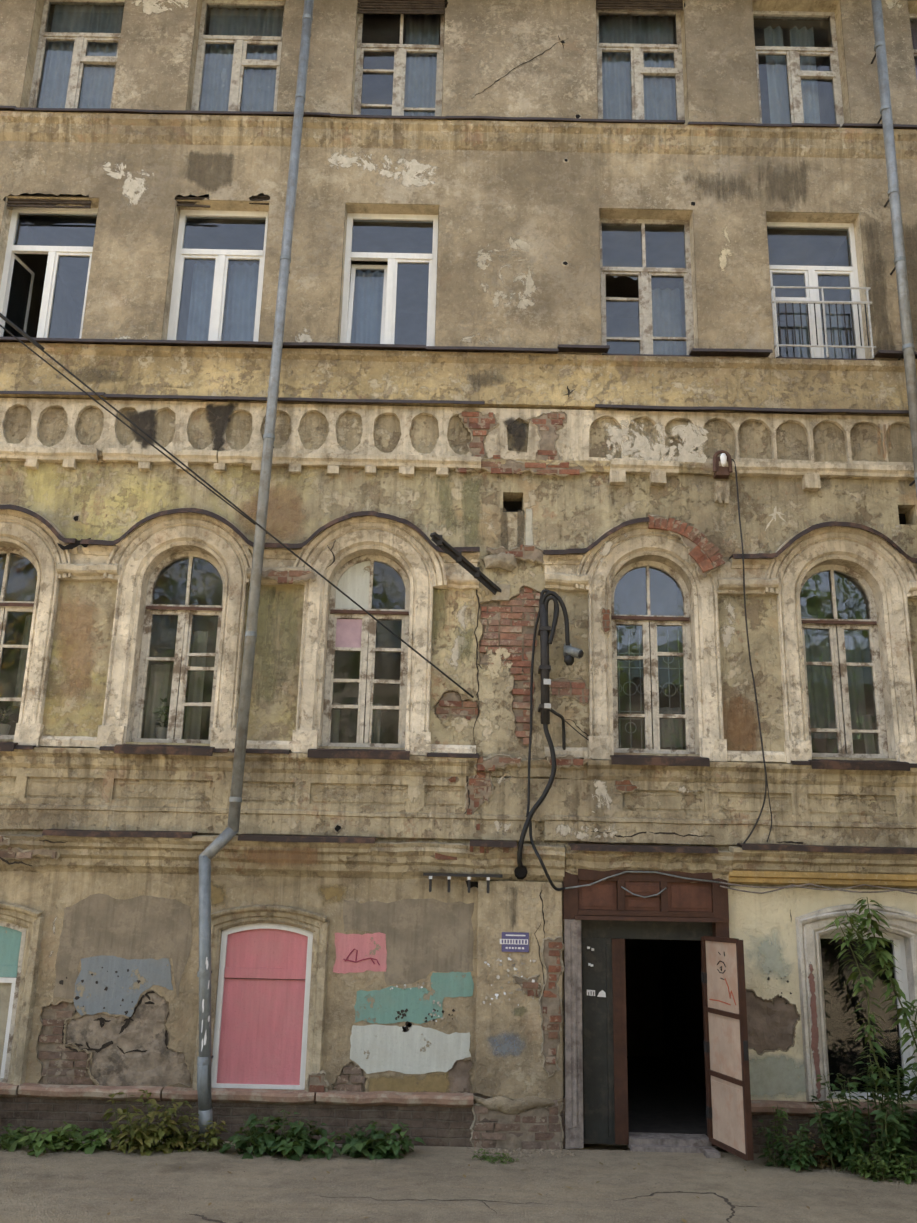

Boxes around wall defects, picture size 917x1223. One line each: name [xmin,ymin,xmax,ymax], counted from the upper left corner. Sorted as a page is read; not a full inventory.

peeling [131,0,188,14]
peeling [103,162,154,205]
peeling [328,151,437,187]
spalling [455,410,586,476]
peeling [605,420,709,463]
spalling [646,515,725,578]
crack [464,565,481,814]
spalling [431,585,593,861]
spalling [0,835,60,861]
peeling [35,893,193,1088]
spalling [746,964,821,1099]